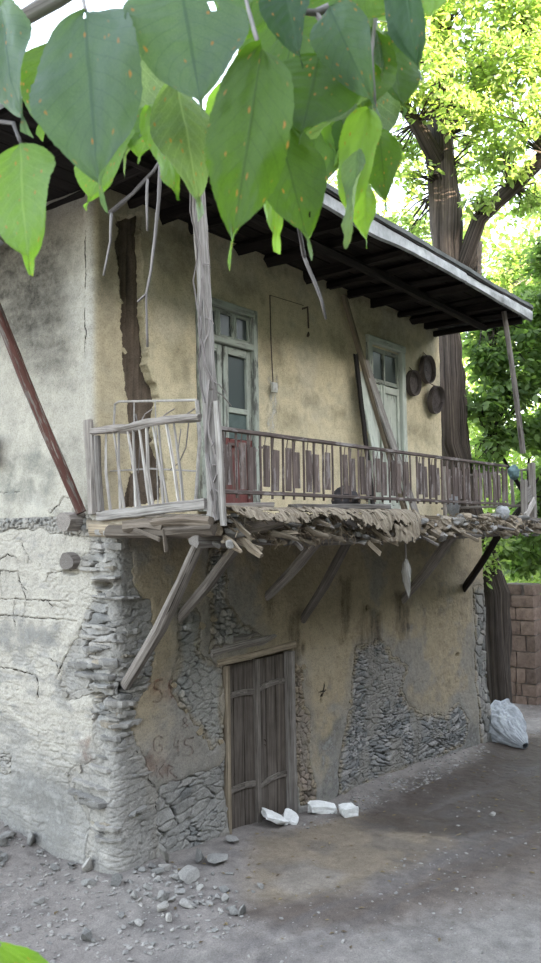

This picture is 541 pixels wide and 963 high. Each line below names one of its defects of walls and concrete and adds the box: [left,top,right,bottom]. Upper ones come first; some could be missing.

spalling [115,216,160,507]
crack [2,655,67,697]
crack [0,542,71,627]
spalling [0,508,228,874]
spalling [295,663,317,806]
spalling [337,585,492,795]